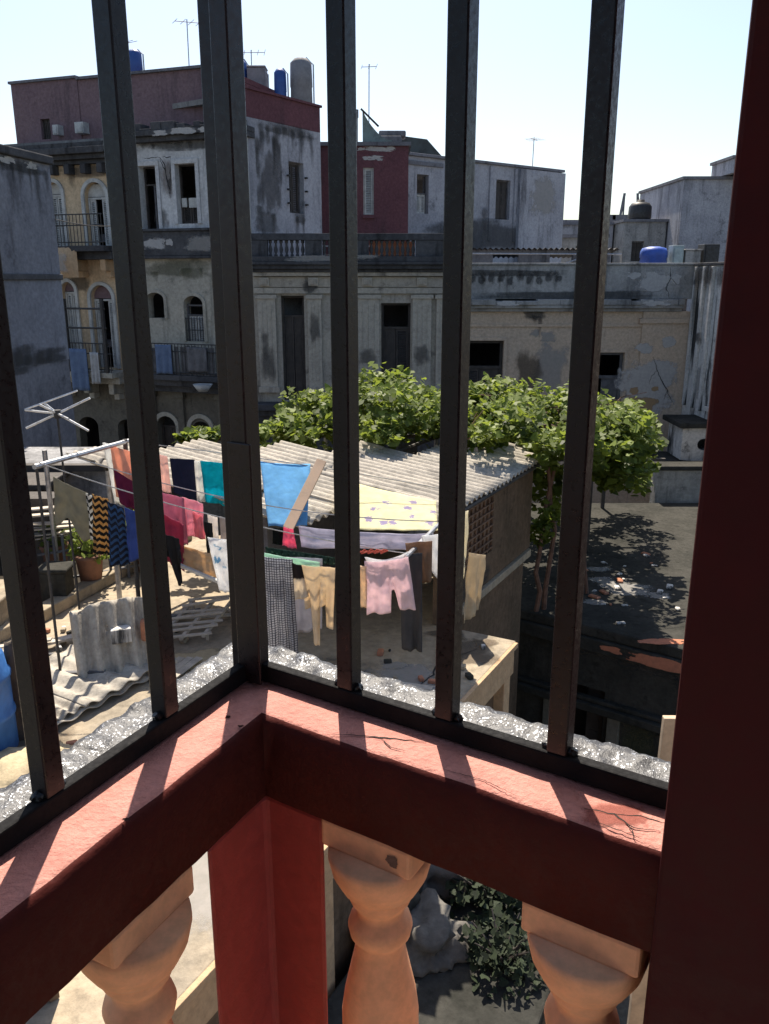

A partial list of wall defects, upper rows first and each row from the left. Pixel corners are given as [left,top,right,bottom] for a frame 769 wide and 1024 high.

peeling [153,126,204,136]
peeling [357,146,395,161]
peeling [144,238,173,249]
peeling [188,237,210,250]
water stain [517,355,541,390]
peeling [615,336,677,416]
crack [336,734,422,751]
crack [584,808,664,839]
peeling [385,855,398,869]